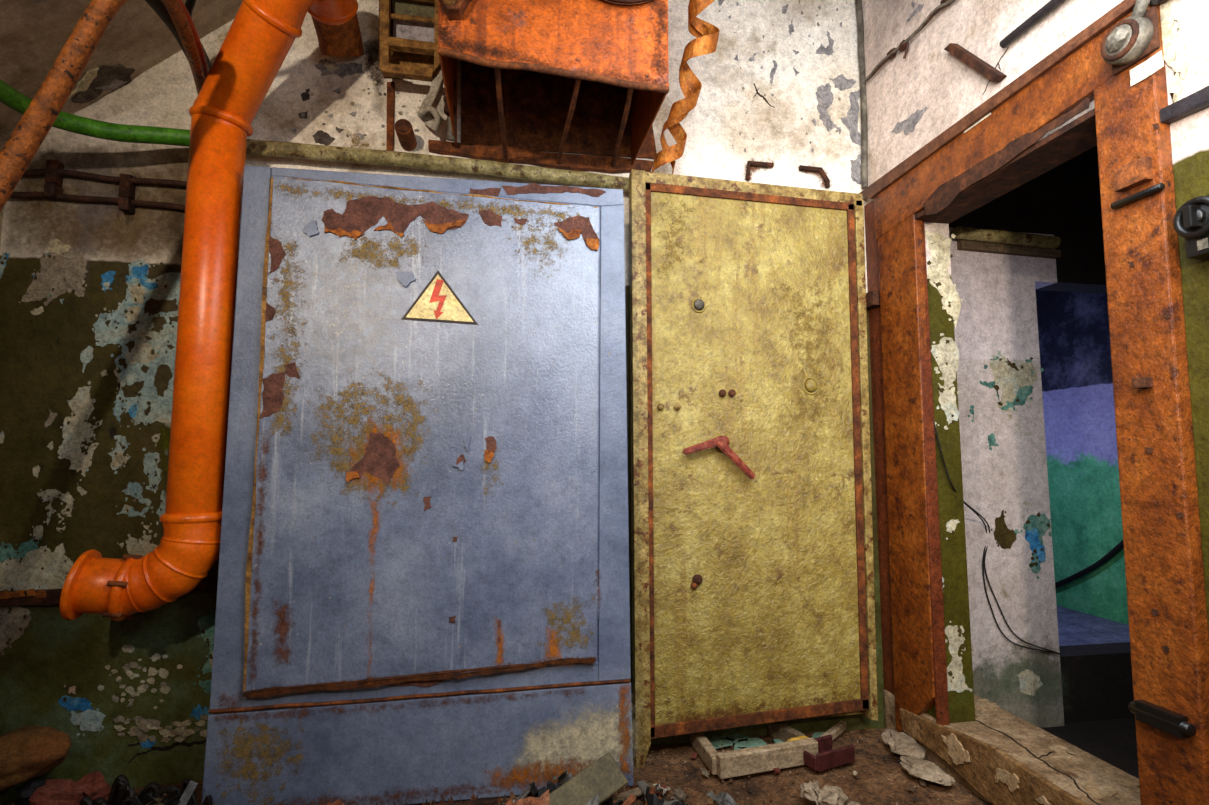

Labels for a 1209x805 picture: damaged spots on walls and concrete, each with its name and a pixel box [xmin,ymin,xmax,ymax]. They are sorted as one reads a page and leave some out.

spalling [801,74,861,185]
peeling [925,229,974,430]
peeling [0,250,181,591]
peeling [988,433,999,451]
peeling [946,519,960,540]
peeling [991,510,1052,579]
peeling [0,606,32,655]
peeling [58,609,216,749]
peeling [945,621,1000,715]
spalling [1048,745,1071,760]